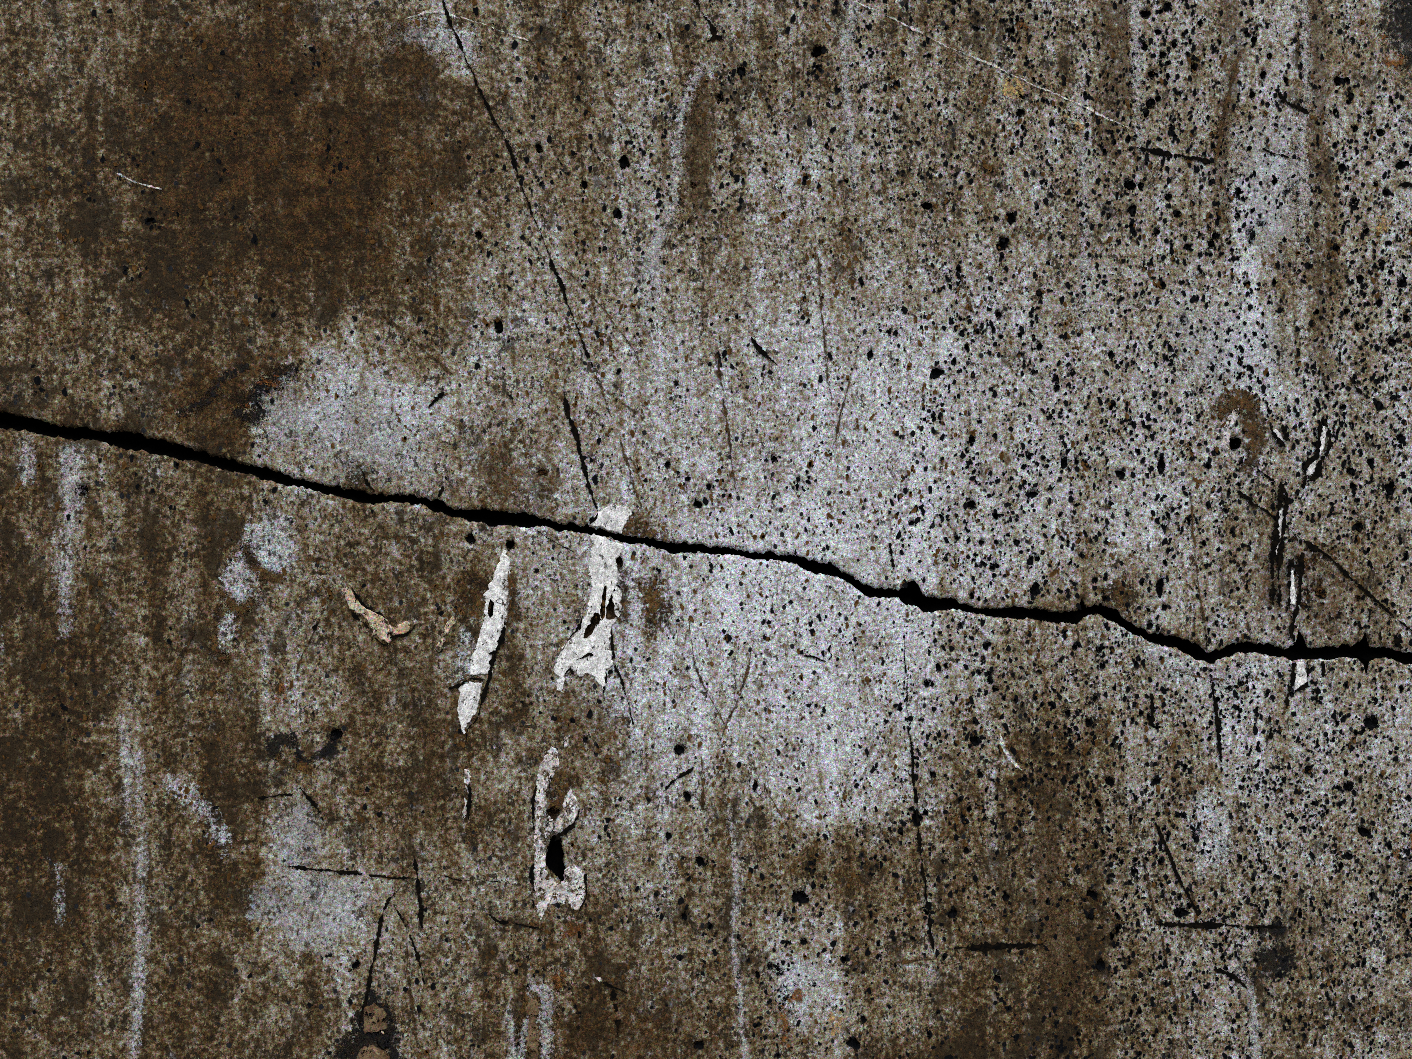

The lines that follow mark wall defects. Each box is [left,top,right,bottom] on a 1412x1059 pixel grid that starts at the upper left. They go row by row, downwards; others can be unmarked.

water stain [385,17,485,65]
crack [442,0,612,417]
water stain [17,435,36,487]
water stain [51,447,89,639]
water stain [176,361,251,418]
water stain [232,394,266,427]
peeling [435,541,521,740]
spalling [554,505,632,693]
crack [0,390,1412,953]
peeling [462,769,472,828]
peeling [529,735,588,920]
spalling [322,986,405,1059]